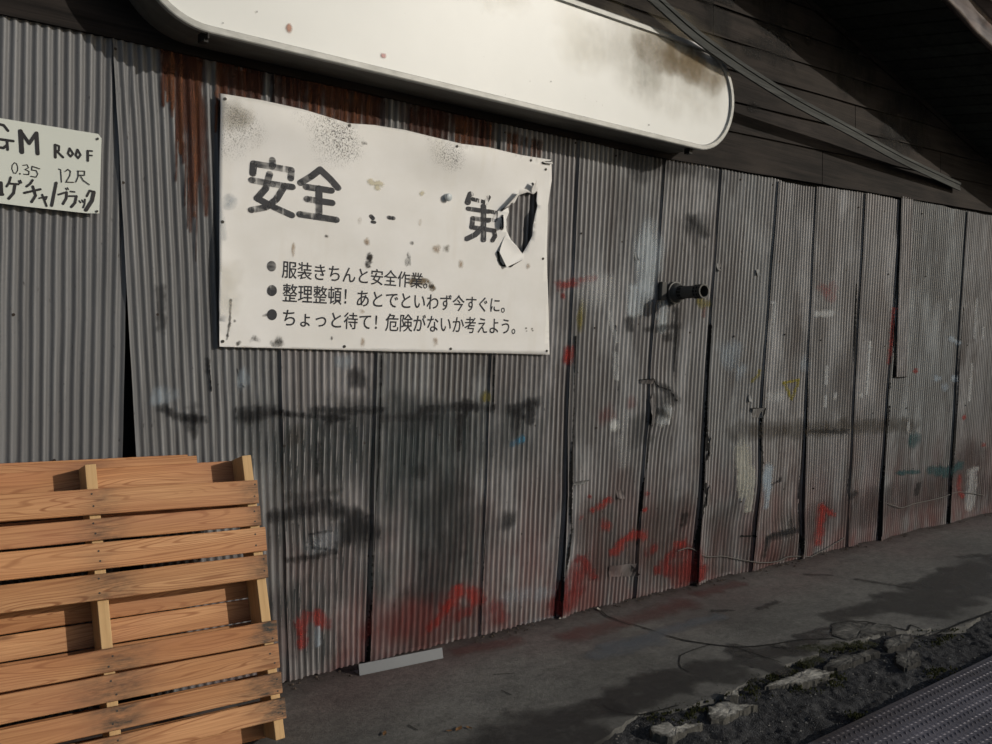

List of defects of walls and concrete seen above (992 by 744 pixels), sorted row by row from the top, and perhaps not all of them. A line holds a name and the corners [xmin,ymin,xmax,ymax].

corrosion [160,49,383,259]
corrosion [409,104,494,147]
corrosion [507,133,543,158]